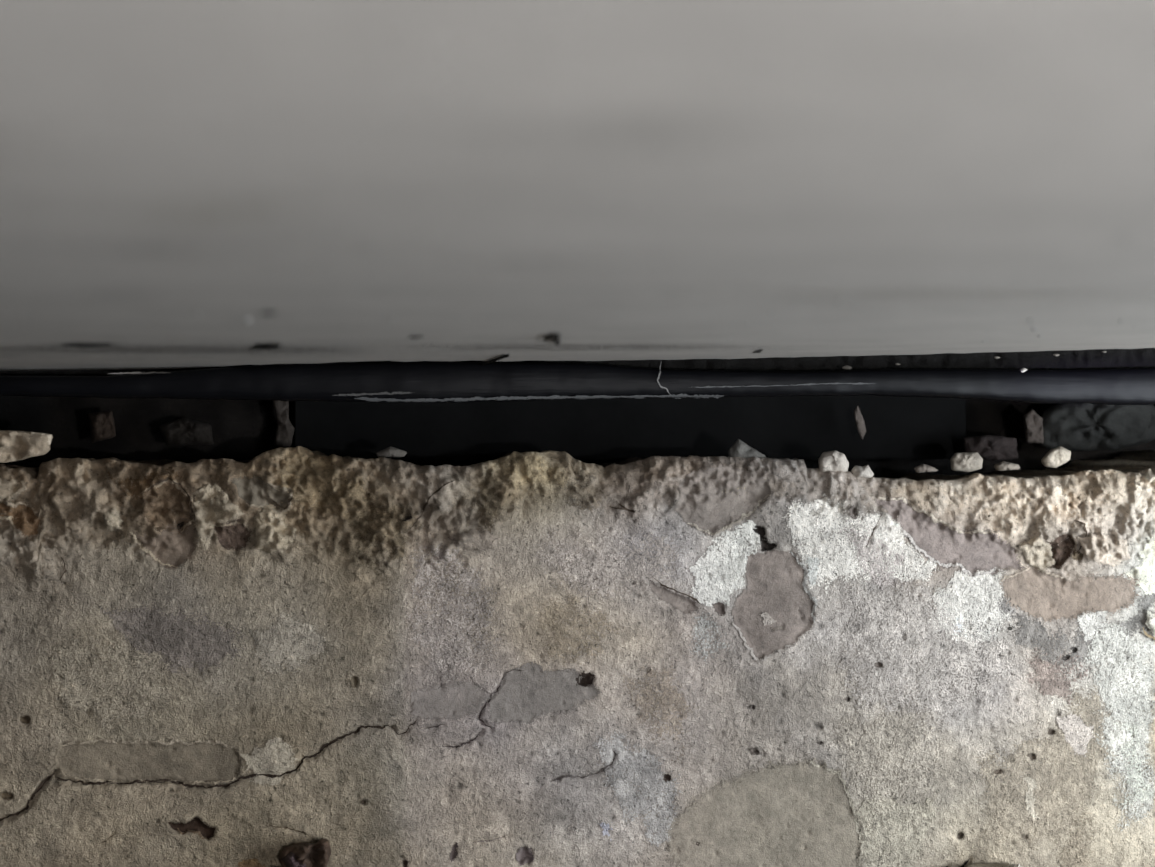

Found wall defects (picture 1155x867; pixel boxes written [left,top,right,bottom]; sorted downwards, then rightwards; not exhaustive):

spalling [648,550,818,664]
spalling [874,496,1142,622]
spalling [52,738,242,787]
crack [0,670,524,821]
spalling [484,662,602,724]